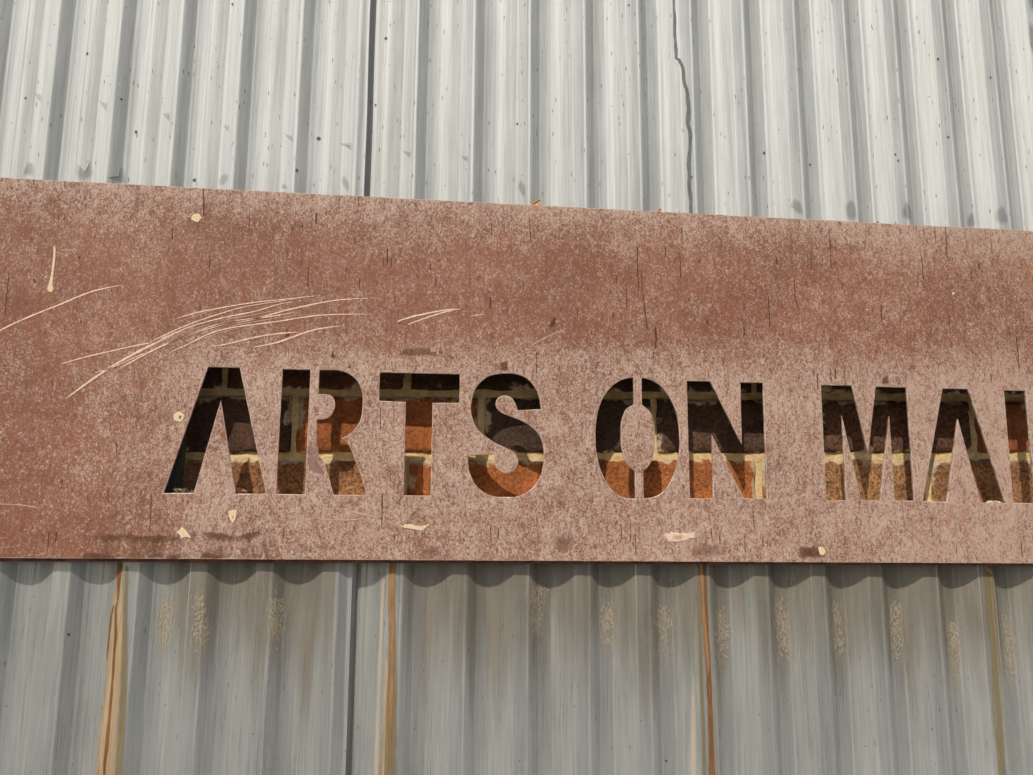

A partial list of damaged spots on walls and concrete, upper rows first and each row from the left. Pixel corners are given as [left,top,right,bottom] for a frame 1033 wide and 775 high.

crack [673,0,693,213]
rust [97,563,128,775]
rust [381,563,396,775]
rust [698,564,715,775]